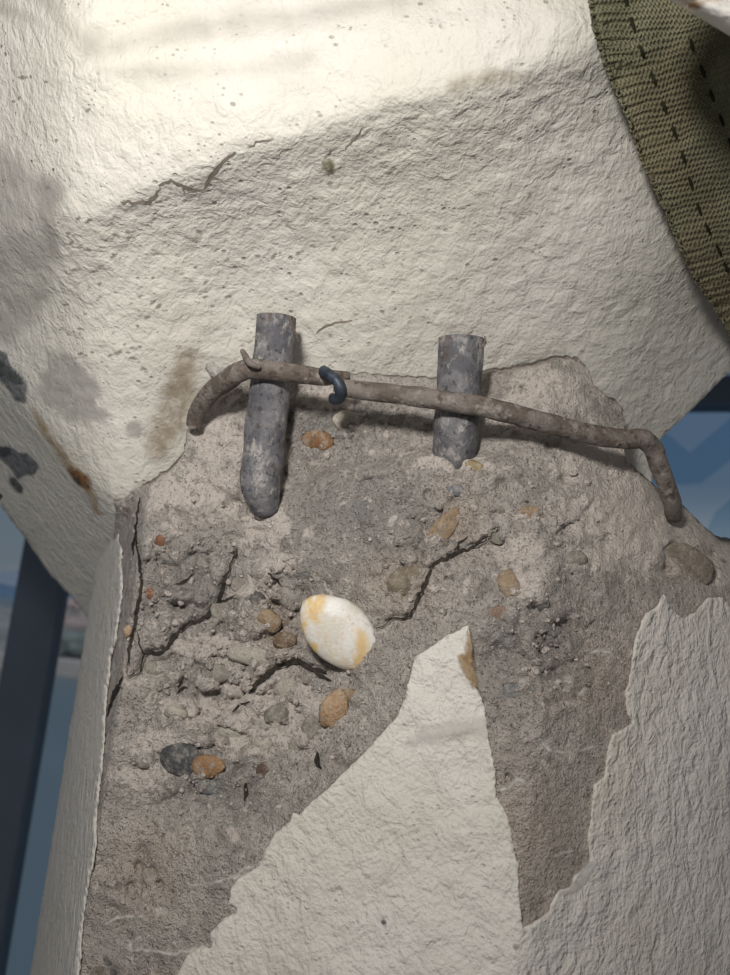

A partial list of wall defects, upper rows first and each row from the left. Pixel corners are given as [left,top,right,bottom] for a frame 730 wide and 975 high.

crack [120,138,273,204]
peeling [0,352,26,402]
spalling [252,312,299,363]
spalling [350,334,625,429]
peeling [0,447,38,493]
rust [37,417,97,507]
crack [106,498,238,716]
crack [375,529,499,629]
crack [232,659,331,712]
spalling [79,379,730,975]